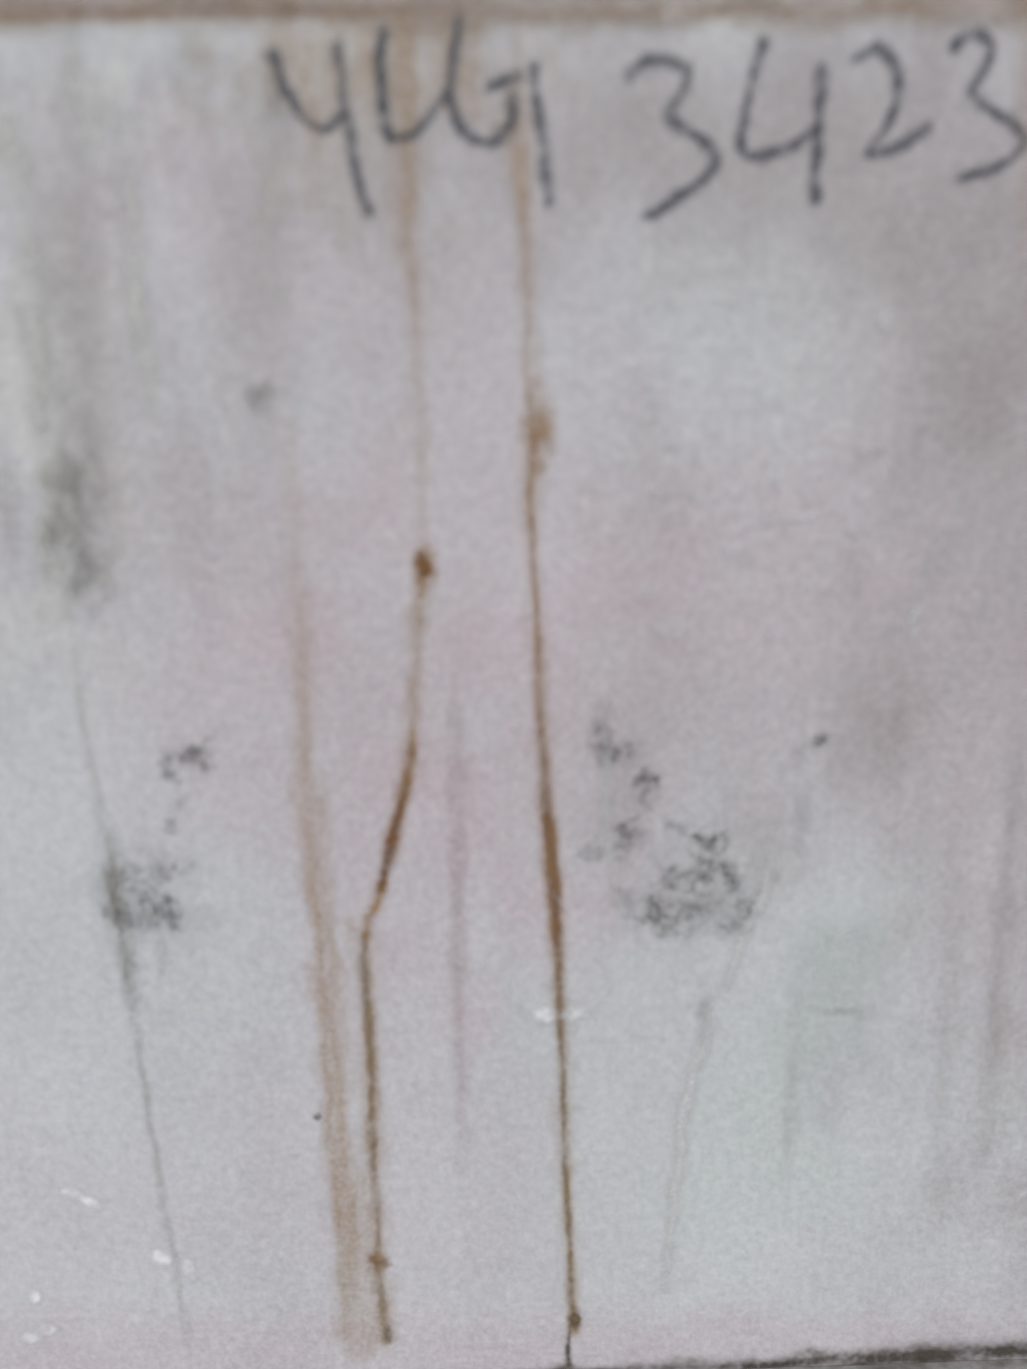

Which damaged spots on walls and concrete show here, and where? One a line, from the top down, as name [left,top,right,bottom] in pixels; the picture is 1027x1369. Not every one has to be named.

rust [415,551,433,584]
rust [569,1313,581,1327]